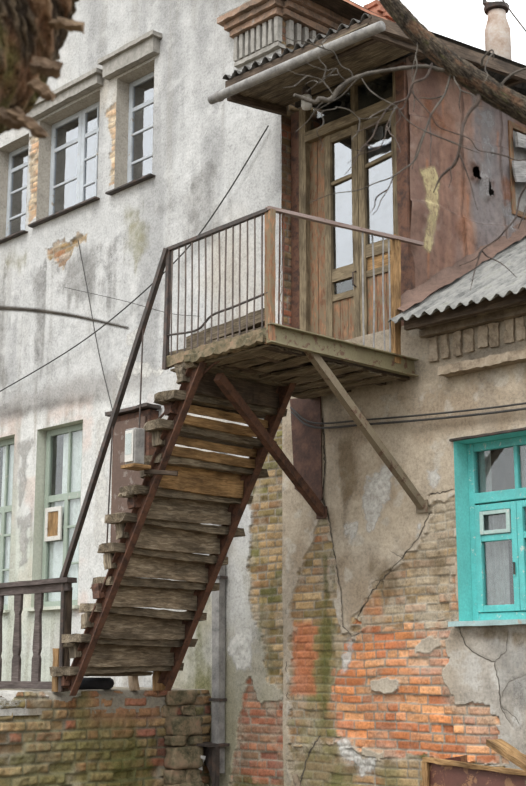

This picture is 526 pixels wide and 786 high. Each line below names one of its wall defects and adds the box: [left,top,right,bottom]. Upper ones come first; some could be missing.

spalling [27,136,39,224]
spalling [104,101,116,187]
peeling [479,110,494,197]
spalling [45,231,88,272]
spalling [274,421,282,450]
crack [322,418,454,637]
spalling [227,452,510,786]
crack [459,628,523,729]